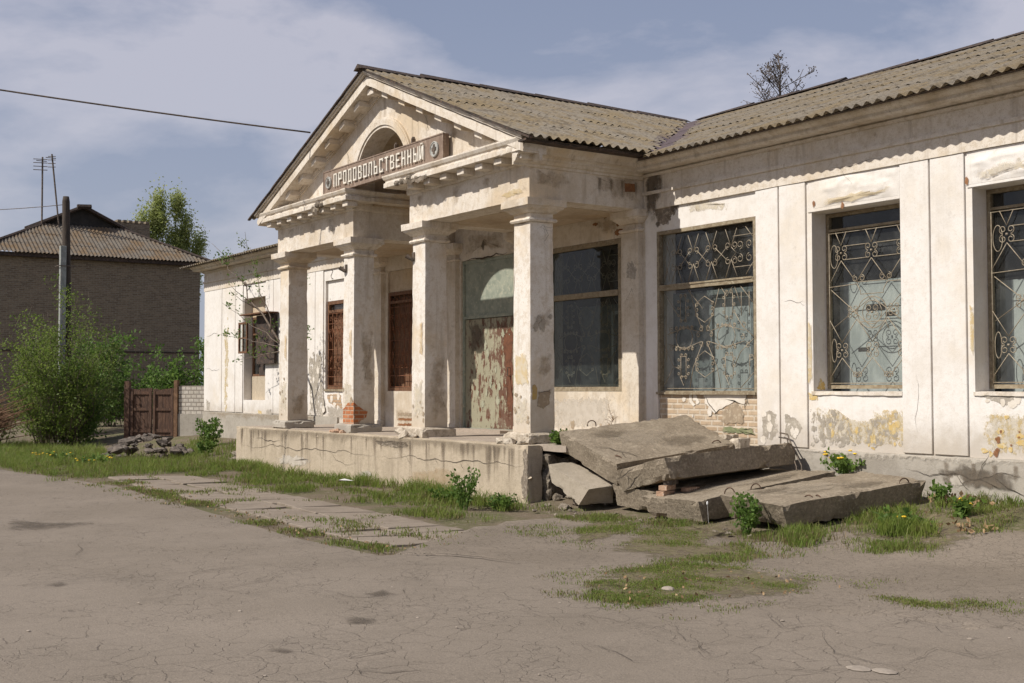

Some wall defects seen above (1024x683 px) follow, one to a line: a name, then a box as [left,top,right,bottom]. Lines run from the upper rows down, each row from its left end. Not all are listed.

peeling [309,349,368,424]
peeling [476,327,501,407]
corrosion [469,323,513,421]
spalling [679,395,744,424]
peeling [750,323,1024,464]
crack [255,440,522,482]